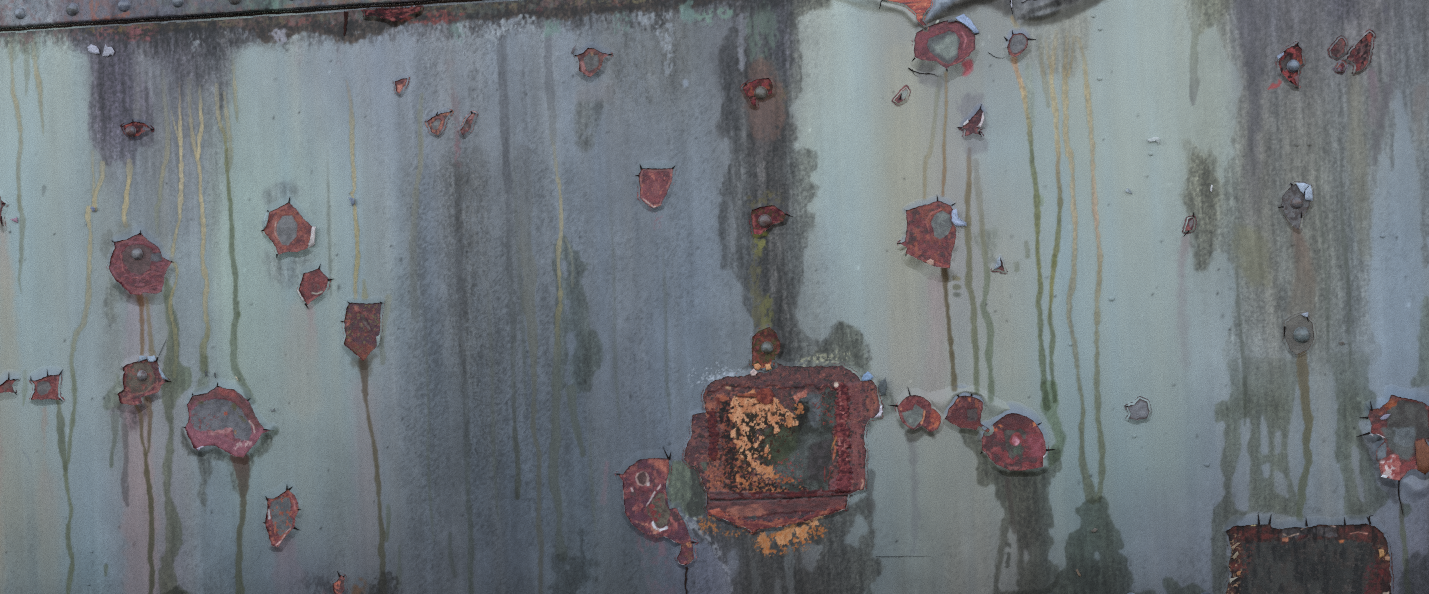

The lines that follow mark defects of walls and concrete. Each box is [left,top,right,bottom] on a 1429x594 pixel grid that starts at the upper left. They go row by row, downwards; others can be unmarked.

peeling [883,0,980,83]
peeling [106,223,177,307]
peeling [260,195,333,310]
peeling [341,296,386,370]
water stain [0,0,937,594]
rust [682,36,951,560]
peeling [896,194,967,283]
water stain [914,0,1429,594]
peeling [180,371,279,465]
peeling [614,322,1055,570]
peeling [1357,384,1429,513]
rust [1222,524,1394,594]